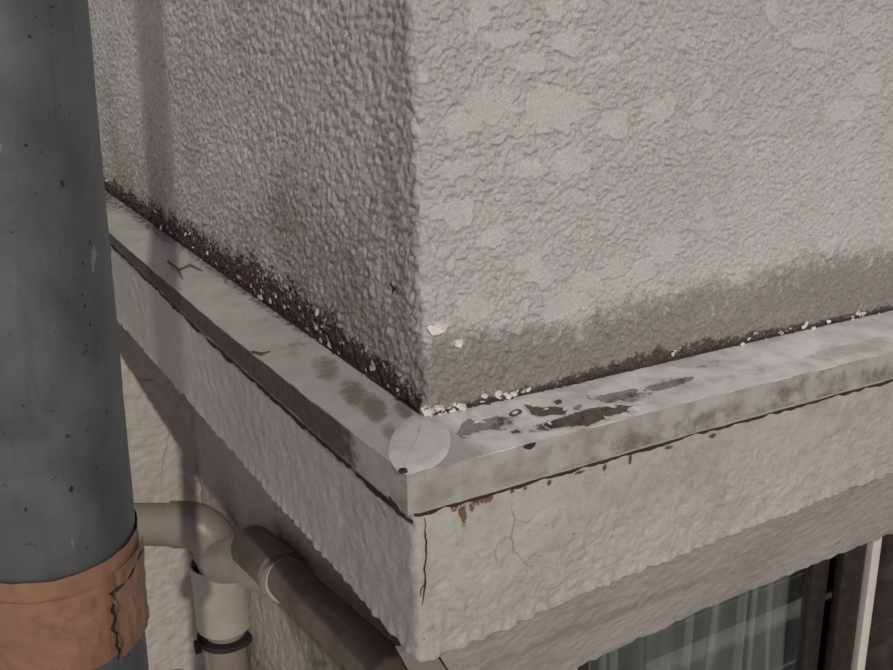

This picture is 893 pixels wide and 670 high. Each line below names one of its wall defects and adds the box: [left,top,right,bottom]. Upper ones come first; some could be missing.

water stain [109,233,357,468]
peeling [427,322,449,335]
water stain [104,177,893,420]
peeling [420,377,694,438]
corrosion [450,496,493,526]
crack [419,518,427,606]